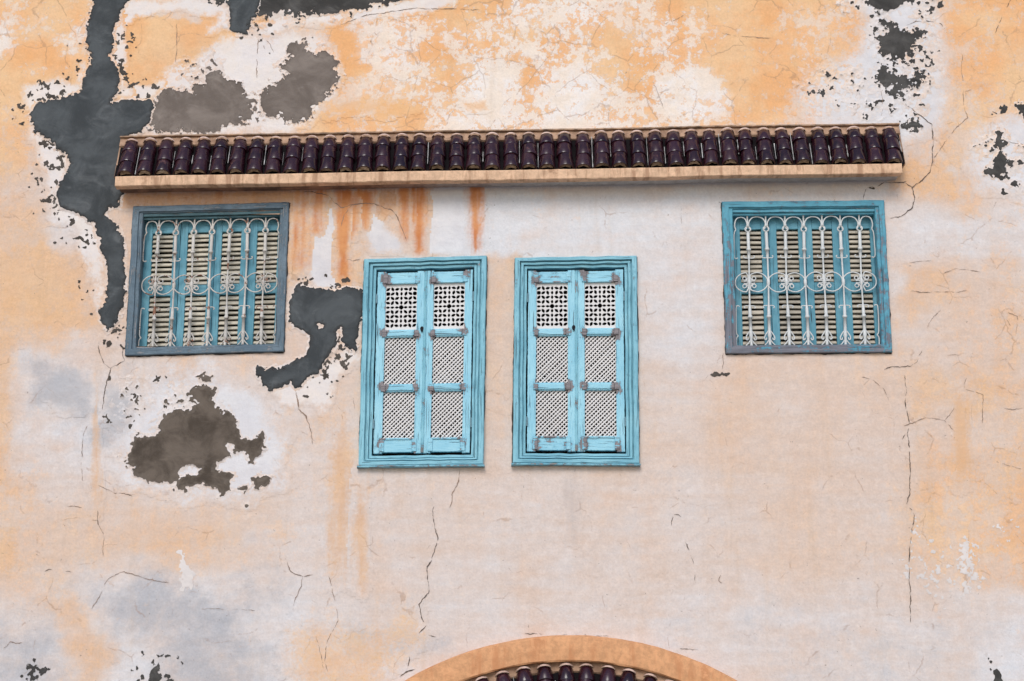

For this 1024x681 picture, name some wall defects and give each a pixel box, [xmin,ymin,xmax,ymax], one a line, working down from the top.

peeling [11,43,108,318]
rust [117,188,433,287]
spalling [110,0,458,135]
peeling [297,207,350,290]
rust [461,187,489,256]
spalling [783,0,958,149]
crack [863,55,968,218]
peeling [959,98,1024,206]
spalling [102,336,361,514]
crack [418,471,460,637]
crack [864,351,1020,621]
spalling [131,651,183,681]